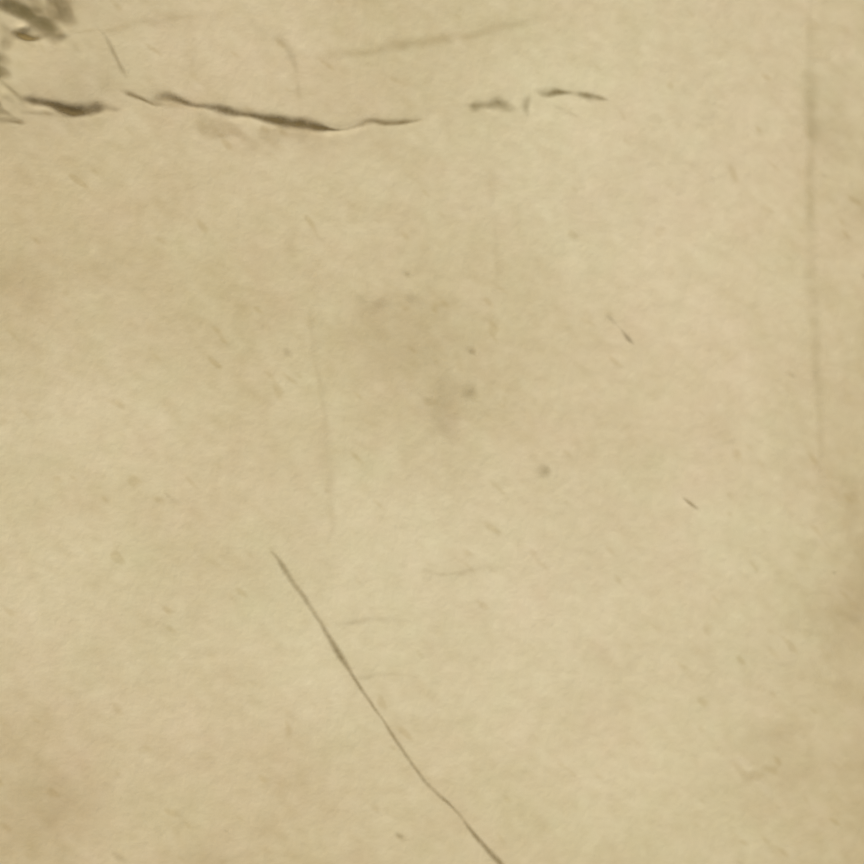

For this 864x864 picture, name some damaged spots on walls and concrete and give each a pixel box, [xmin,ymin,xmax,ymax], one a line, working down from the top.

spalling [10,2,51,29]
spalling [16,33,38,41]
crack [31,99,99,116]
crack [216,107,336,130]